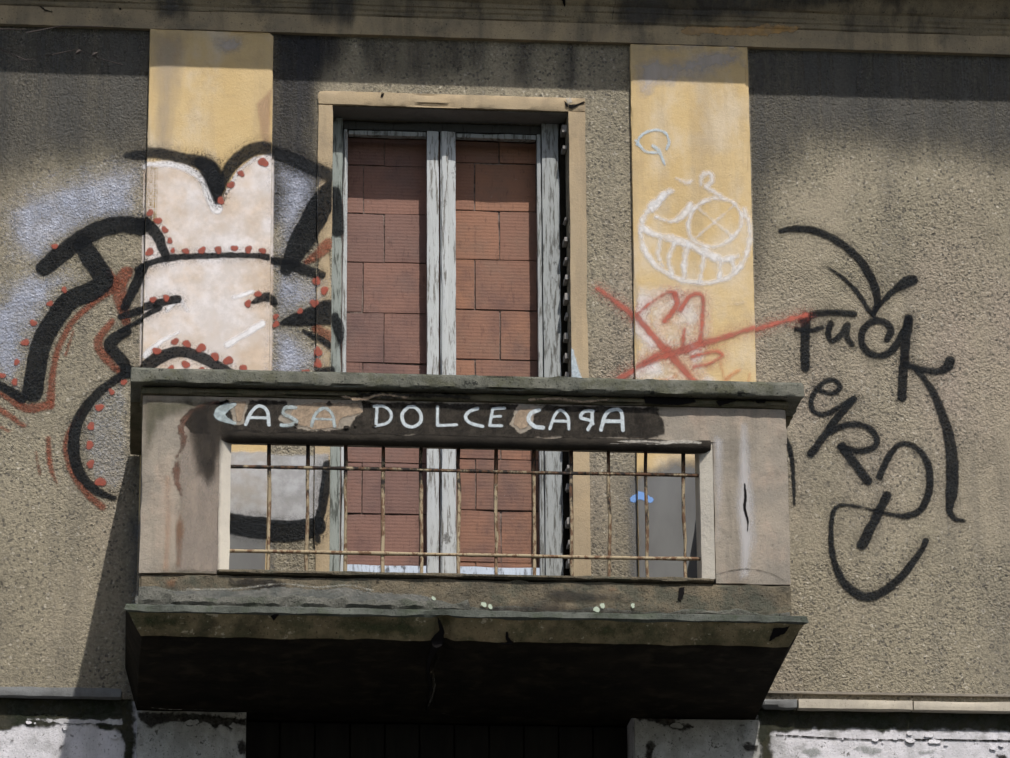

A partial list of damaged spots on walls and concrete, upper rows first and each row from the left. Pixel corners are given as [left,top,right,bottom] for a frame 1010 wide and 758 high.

leakage [620,0,826,24]
leakage [0,26,150,168]
crack [742,483,750,531]
peeling [26,718,122,739]
peeling [857,731,948,754]